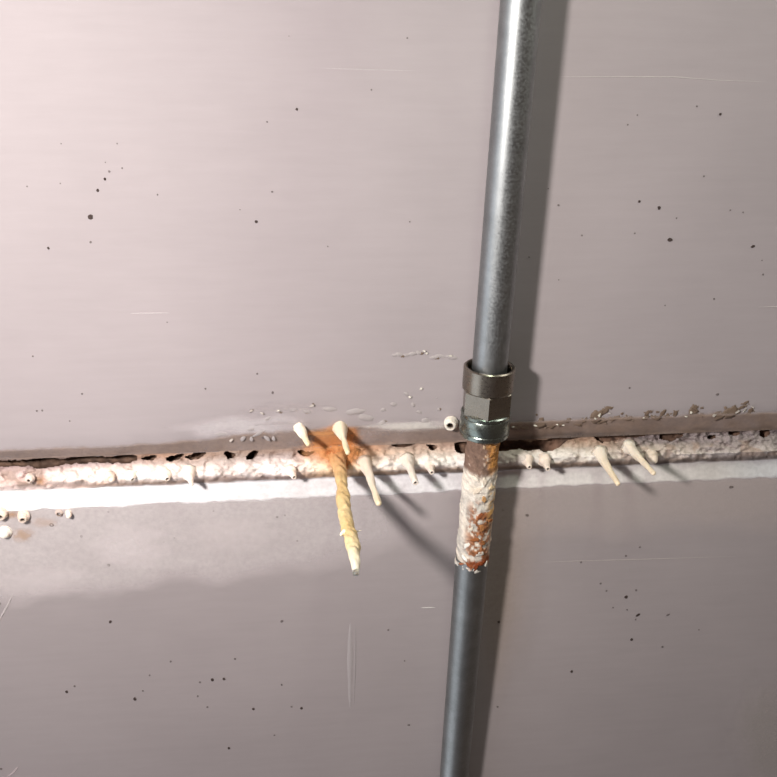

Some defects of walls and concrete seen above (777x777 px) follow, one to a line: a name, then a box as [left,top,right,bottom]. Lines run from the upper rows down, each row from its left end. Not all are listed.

rust [308,431,359,469]
damp [347,423,467,495]
peeling [510,401,755,431]
damp [495,413,777,488]
damp [0,422,344,591]
rust [454,440,500,574]